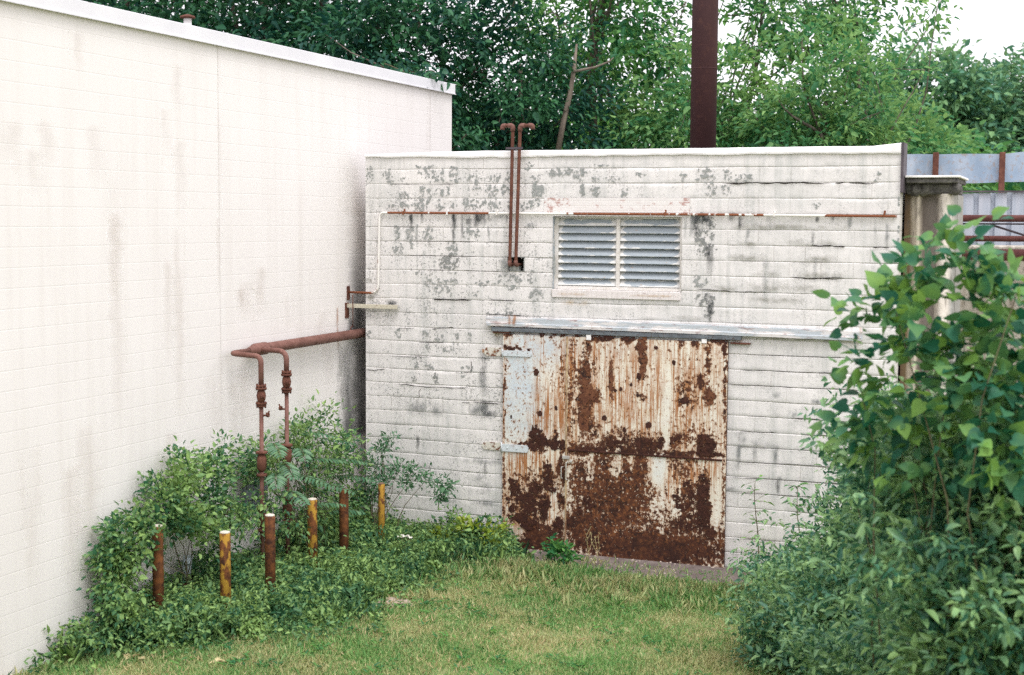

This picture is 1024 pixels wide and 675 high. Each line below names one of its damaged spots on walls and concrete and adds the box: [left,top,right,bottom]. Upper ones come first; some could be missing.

peeling [366,162,628,212]
peeling [692,212,717,256]
peeling [415,225,480,296]
spalling [472,235,555,302]
peeling [693,274,715,321]
corrosion [525,332,658,432]
leakage [345,392,364,439]
corrosion [526,406,565,452]
corrosion [581,421,682,455]
corrosion [696,434,722,457]
corrosion [506,464,595,532]
corrosion [670,474,717,540]